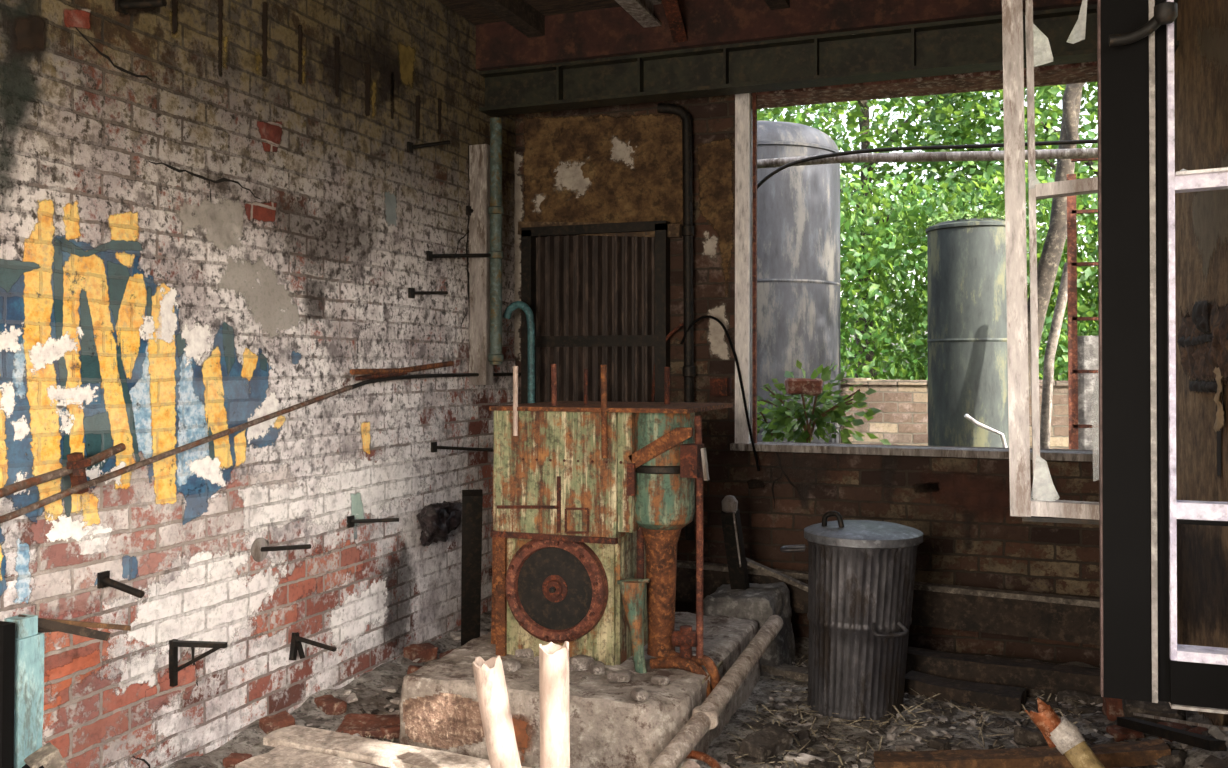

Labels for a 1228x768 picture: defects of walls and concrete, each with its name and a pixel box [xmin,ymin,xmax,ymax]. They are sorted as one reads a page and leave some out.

crack [75,27,152,81]
peeling [610,137,637,169]
crack [149,161,260,203]
spalling [244,202,277,222]
peeling [0,322,85,375]
peeling [139,287,211,368]
flaking render [1177,301,1228,432]
peeling [0,381,32,441]
peeling [46,384,98,435]
peeling [246,392,283,444]
peeling [28,451,364,768]
spalling [335,692,485,749]